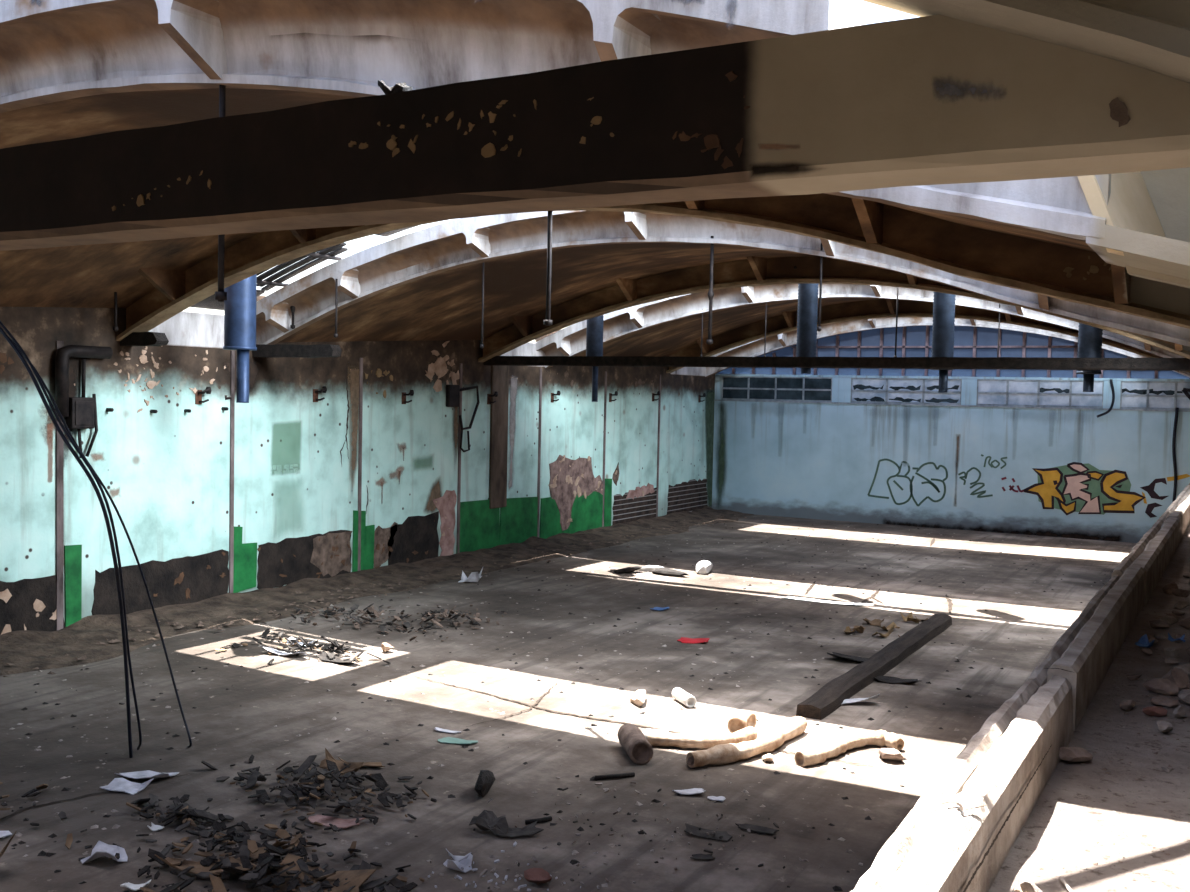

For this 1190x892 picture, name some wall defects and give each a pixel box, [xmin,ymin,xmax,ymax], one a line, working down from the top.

damp [934,80,1004,99]
peeling [377,100,522,158]
peeling [579,116,602,144]
peeling [425,341,460,392]
spalling [549,455,708,531]
spalling [374,490,457,568]
spalling [0,575,65,635]
spalling [91,549,229,615]
spalling [257,530,352,589]